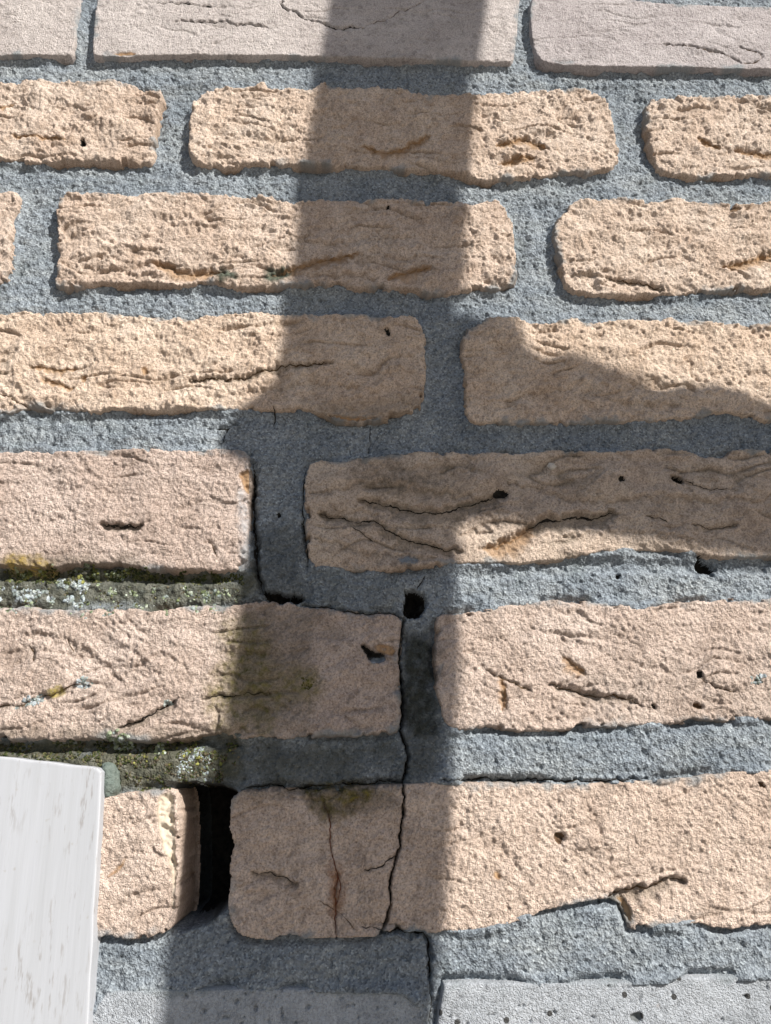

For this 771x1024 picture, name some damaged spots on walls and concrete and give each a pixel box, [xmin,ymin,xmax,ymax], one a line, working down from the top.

crack [249,605,432,1024]